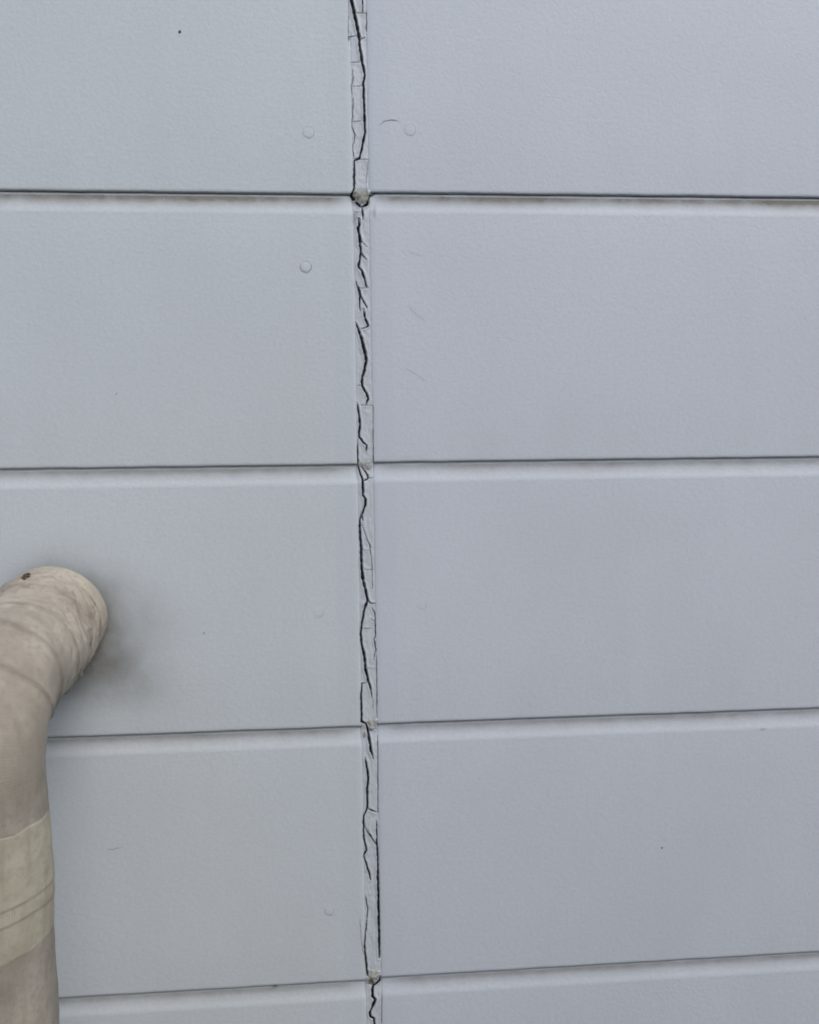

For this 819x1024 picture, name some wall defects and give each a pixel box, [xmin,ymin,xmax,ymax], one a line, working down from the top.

crack [348,0,382,1024]